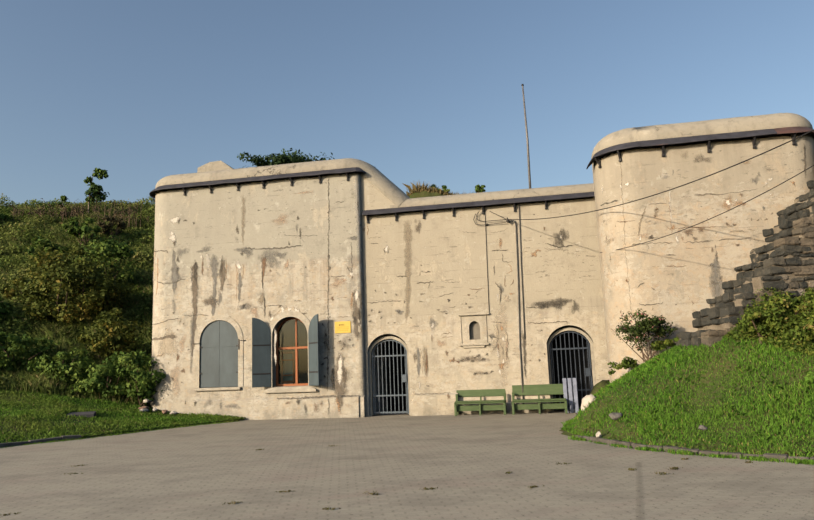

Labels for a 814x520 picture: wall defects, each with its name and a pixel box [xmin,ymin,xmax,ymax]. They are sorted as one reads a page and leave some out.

damp [171,251,180,290]
damp [190,247,222,361]
damp [235,248,250,309]
rust [252,258,267,316]
damp [397,223,421,318]
damp [526,298,577,310]
damp [277,355,359,414]